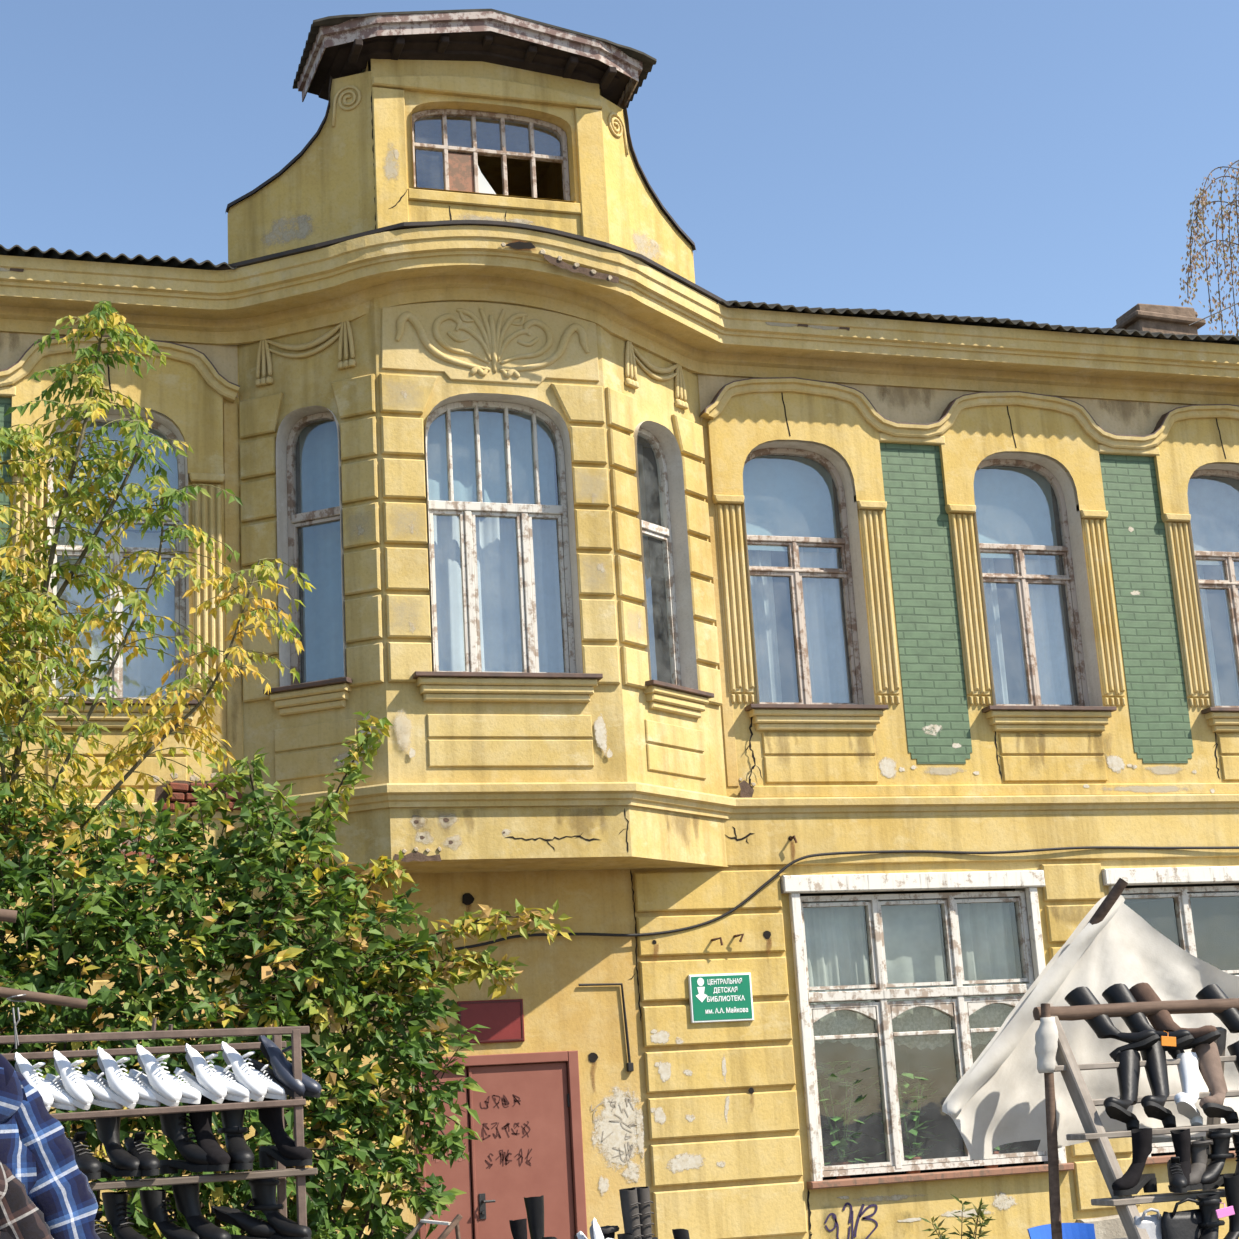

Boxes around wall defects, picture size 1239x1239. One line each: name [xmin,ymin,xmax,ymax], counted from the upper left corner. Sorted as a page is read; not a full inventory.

spalling [540,249,619,283]
peeling [395,713,416,758]
peeling [594,714,613,758]
crack [746,717,763,785]
peeling [879,757,979,778]
spalling [394,814,462,862]
crack [726,826,755,844]
crack [505,808,642,1020]
peeling [651,1029,683,1044]
peeling [592,1087,666,1195]
peeling [667,1153,726,1173]